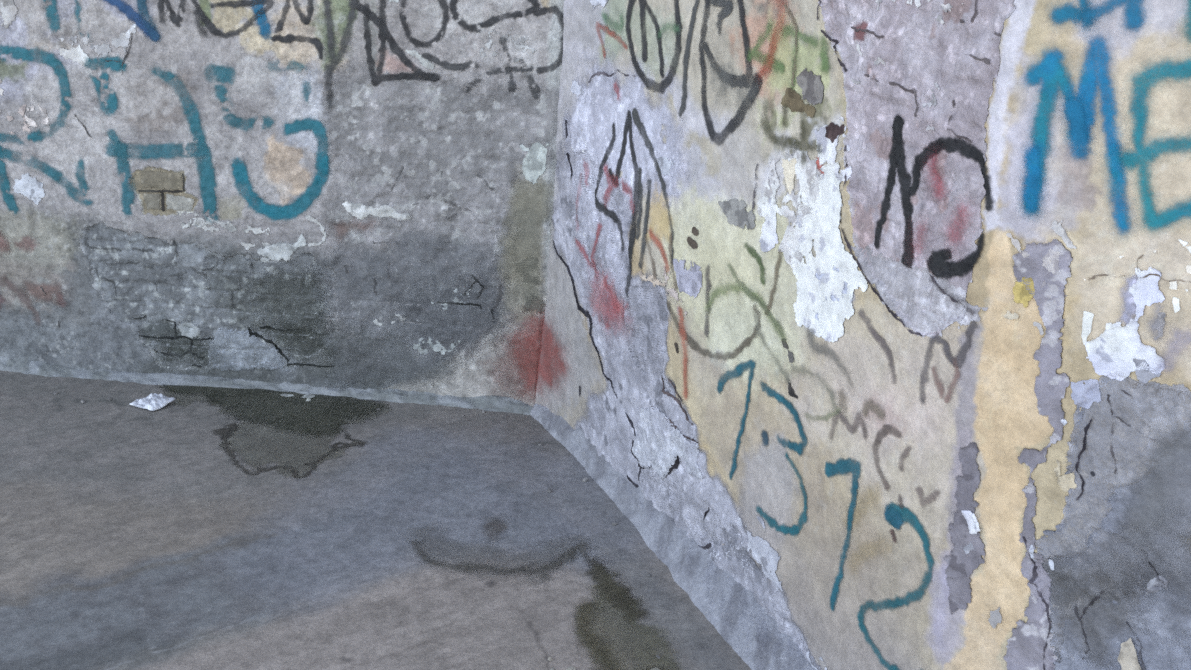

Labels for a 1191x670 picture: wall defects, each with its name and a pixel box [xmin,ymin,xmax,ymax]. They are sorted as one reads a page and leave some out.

spalling [718,0,1016,342]
leakage [164,385,389,478]
crack [247,326,331,368]
spalling [79,50,827,670]
leakage [414,544,678,670]
peeling [944,442,985,615]
spalling [988,220,1191,670]